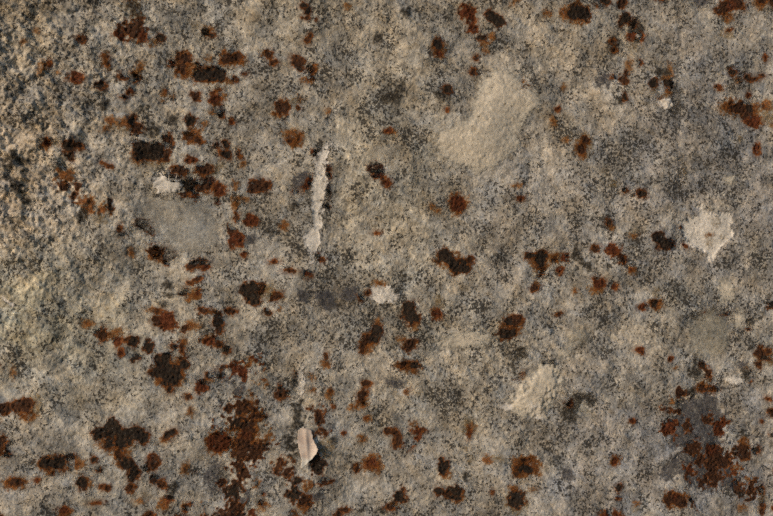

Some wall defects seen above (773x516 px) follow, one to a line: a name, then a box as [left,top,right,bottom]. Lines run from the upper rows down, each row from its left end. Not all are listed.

corrosion [457,3,507,75]
corrosion [543,0,645,48]
corrosion [714,64,773,129]
corrosion [103,49,272,259]
corrosion [434,248,475,276]
corrosion [524,249,569,293]
corrosion [492,314,526,342]
corrosion [0,395,42,422]
corrosion [81,257,347,516]
corrosion [0,416,203,516]
corrosion [462,419,543,515]
corrosion [657,378,773,516]